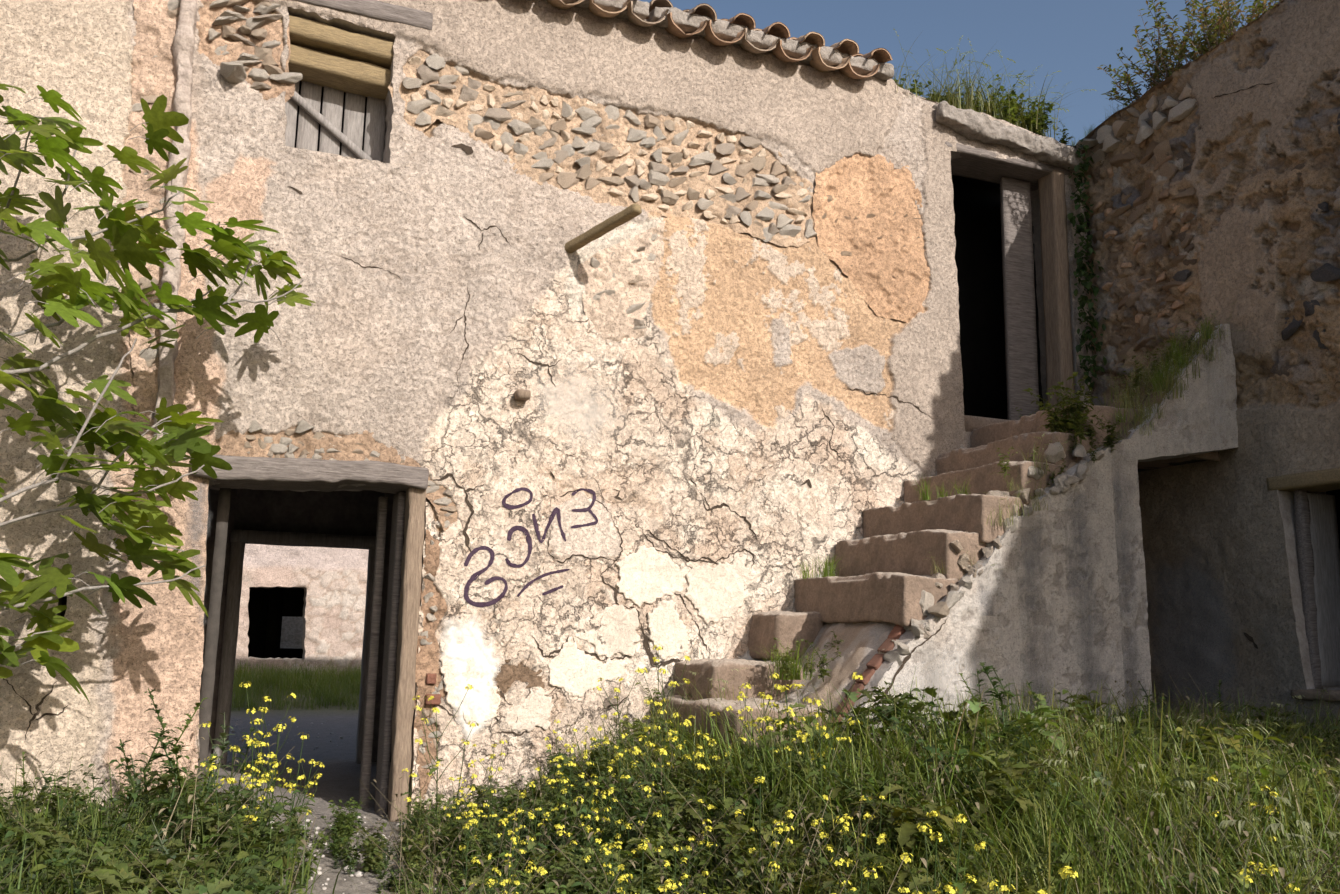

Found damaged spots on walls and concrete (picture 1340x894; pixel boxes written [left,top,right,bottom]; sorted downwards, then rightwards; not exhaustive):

spalling [1076,83,1196,164]
spalling [388,50,931,342]
spalling [1172,230,1197,282]
spalling [1281,299,1329,350]
peeling [210,420,754,800]